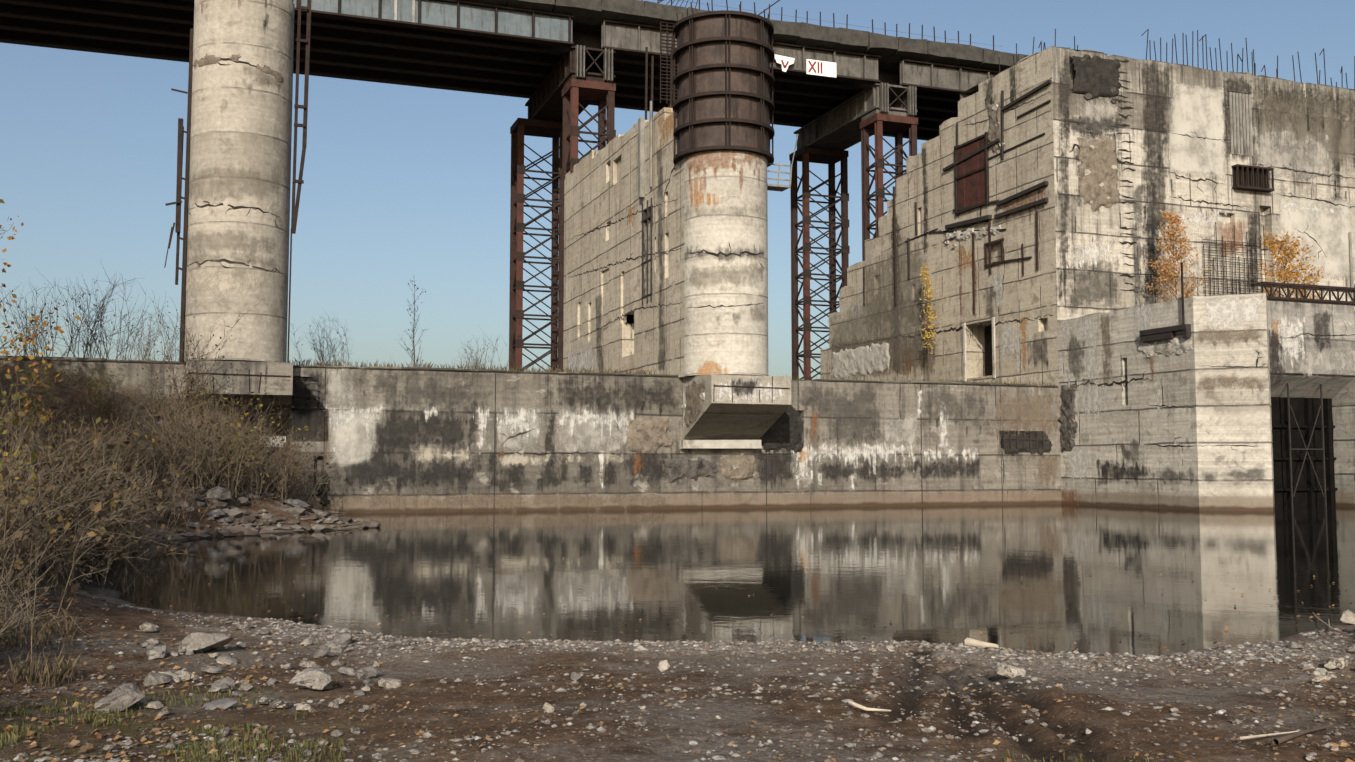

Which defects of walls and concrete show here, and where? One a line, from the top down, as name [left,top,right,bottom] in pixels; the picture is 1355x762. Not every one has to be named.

crack [193,55,273,75]
crack [187,250,280,272]
crack [189,201,280,231]
crack [567,164,681,241]
water stain [644,150,665,370]
crack [575,243,765,277]
rust [688,150,761,209]
water stain [985,59,1119,426]
water stain [1132,64,1355,347]
crack [570,302,759,343]
water stain [1198,214,1355,389]
water stain [292,297,687,495]